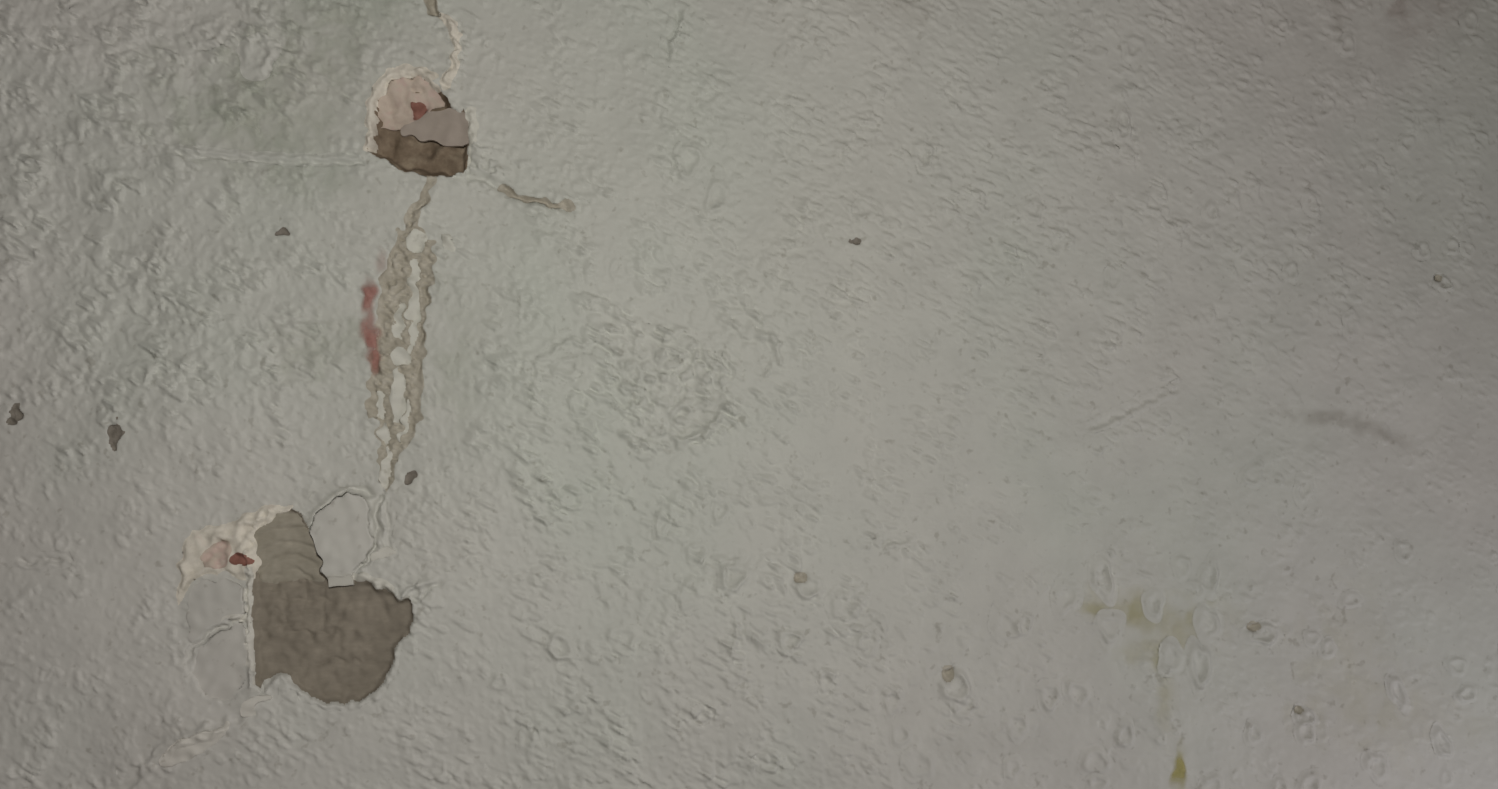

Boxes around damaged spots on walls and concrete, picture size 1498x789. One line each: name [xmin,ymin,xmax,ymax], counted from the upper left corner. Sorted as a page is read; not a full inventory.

crack [422,0,467,95]
peeling [363,63,504,492]
flaking render [176,493,454,712]
crack [298,474,399,574]